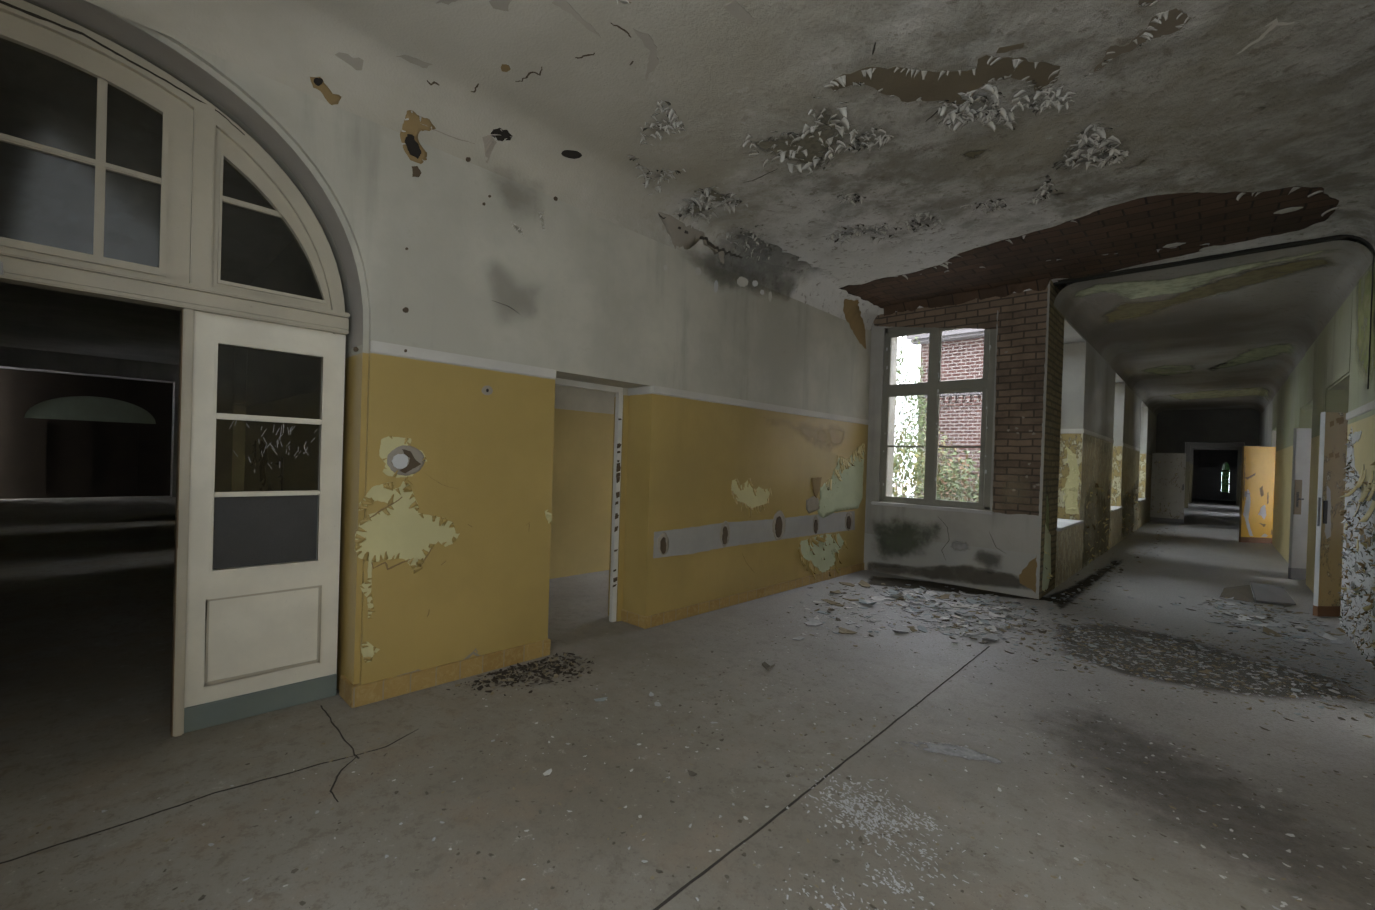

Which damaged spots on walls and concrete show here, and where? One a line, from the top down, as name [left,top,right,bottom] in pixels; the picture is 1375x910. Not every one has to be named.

peeling [1085,0,1191,77]
flaking render [400,110,436,177]
peeling [743,43,1076,179]
peeling [1031,124,1145,205]
water stain [695,233,808,301]
flaking render [826,186,1339,593]
peeling [354,436,459,619]
flaking render [653,443,866,580]
water stain [868,519,1122,609]
peeling [1324,426,1375,669]
water stain [1059,625,1362,700]